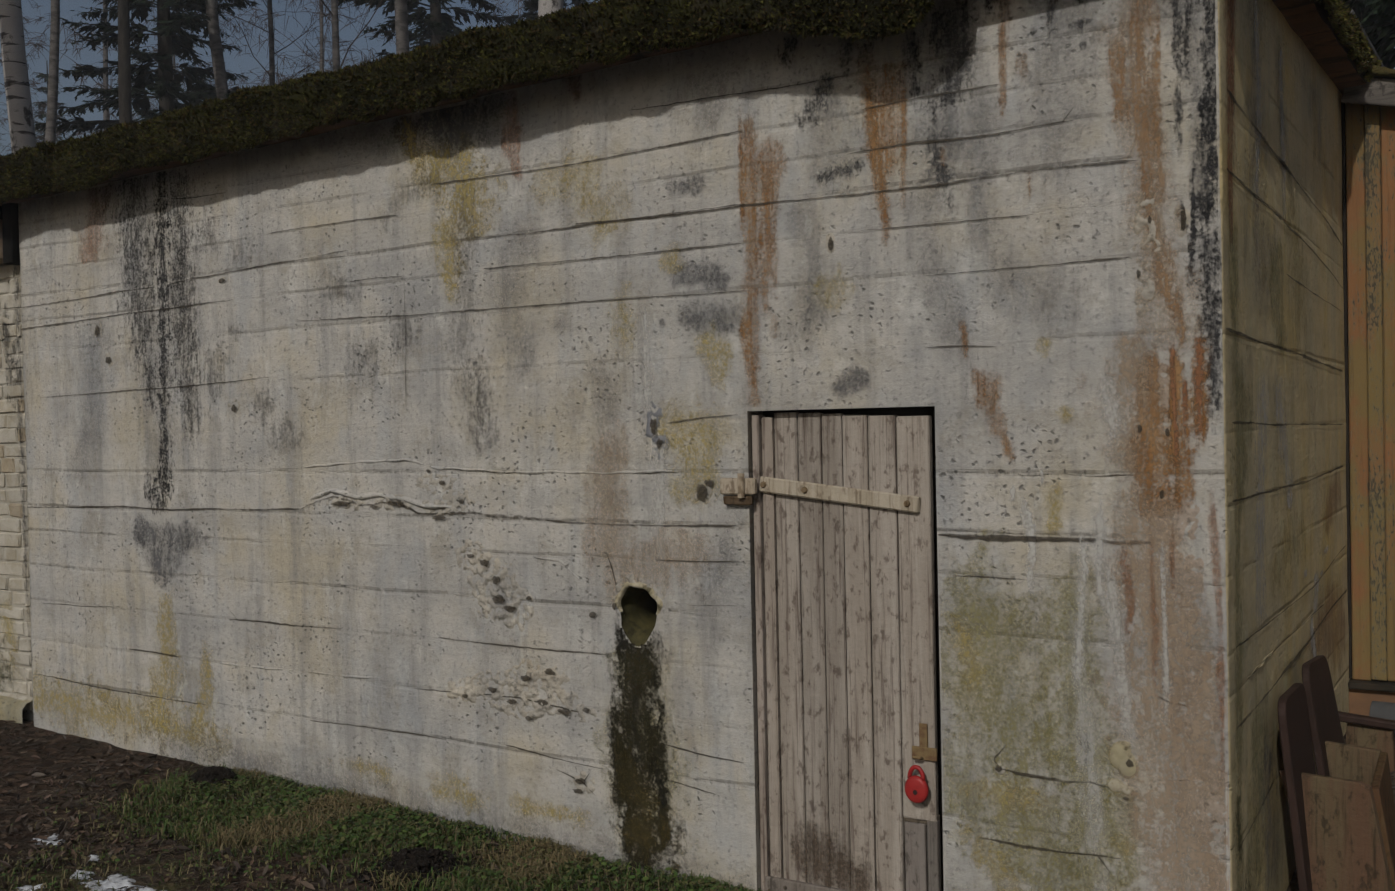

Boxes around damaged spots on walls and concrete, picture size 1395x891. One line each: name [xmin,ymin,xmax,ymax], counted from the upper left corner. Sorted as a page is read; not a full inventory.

damp [1027,0,1059,35]
rust [738,119,782,405]
rust [858,55,906,236]
rust [1108,0,1209,517]
damp [1171,0,1223,414]
damp [33,169,281,771]
crack [28,493,737,584]
spalling [455,539,536,632]
spalling [446,658,597,722]
damp [609,626,682,879]